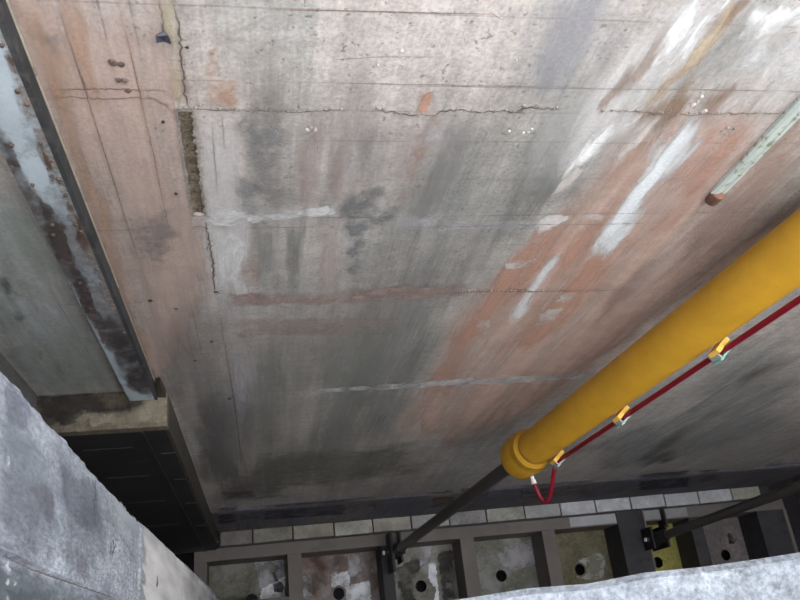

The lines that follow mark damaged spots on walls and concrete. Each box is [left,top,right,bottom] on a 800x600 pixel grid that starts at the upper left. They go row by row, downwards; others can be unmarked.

rust [6,0,205,394]
spalling [173,106,208,217]
crack [47,2,343,294]
damp [239,108,288,169]
damp [205,183,383,296]
crack [375,86,599,117]
efflorescence [512,256,557,319]
efflorescence [527,214,568,231]
rust [412,135,794,439]
efflorescence [593,122,699,252]